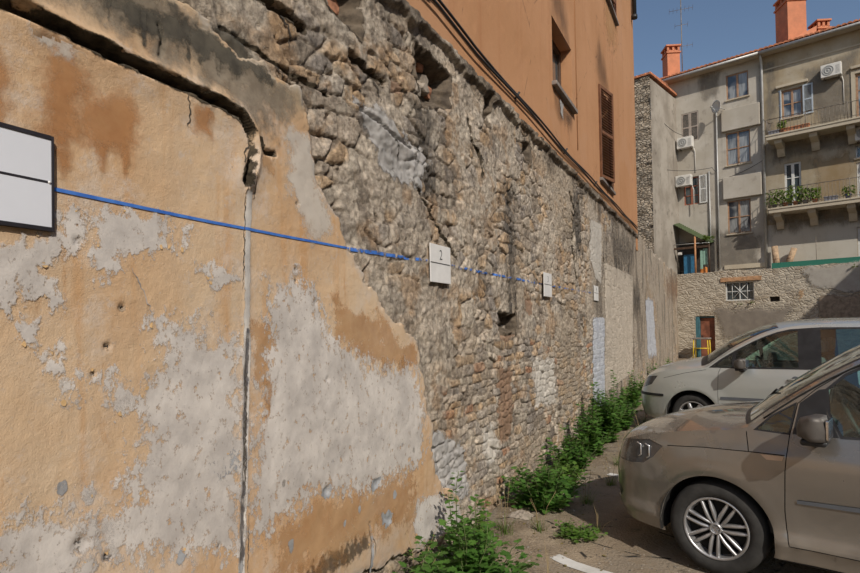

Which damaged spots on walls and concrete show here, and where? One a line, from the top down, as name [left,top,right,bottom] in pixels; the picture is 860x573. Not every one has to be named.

leakage [39,36,136,171]
crack [218,25,329,97]
crack [256,0,307,46]
spalling [391,42,452,110]
crack [0,0,258,573]
peeling [0,195,430,573]